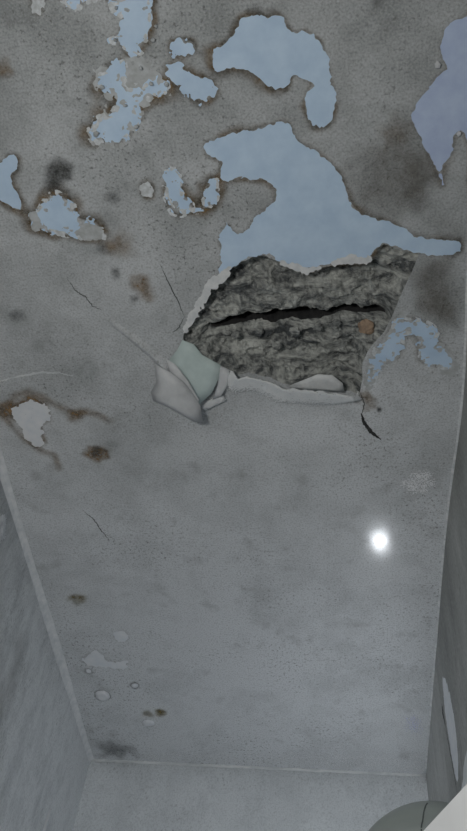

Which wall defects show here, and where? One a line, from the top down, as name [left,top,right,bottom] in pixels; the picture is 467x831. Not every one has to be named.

peeling [31,0,45,15]
peeling [60,0,337,152]
peeling [411,16,467,185]
peeling [0,154,107,242]
spalling [139,121,462,422]
peeling [0,396,51,448]
corrosion [85,448,109,462]
crack [361,395,381,440]
peeling [442,678,458,792]